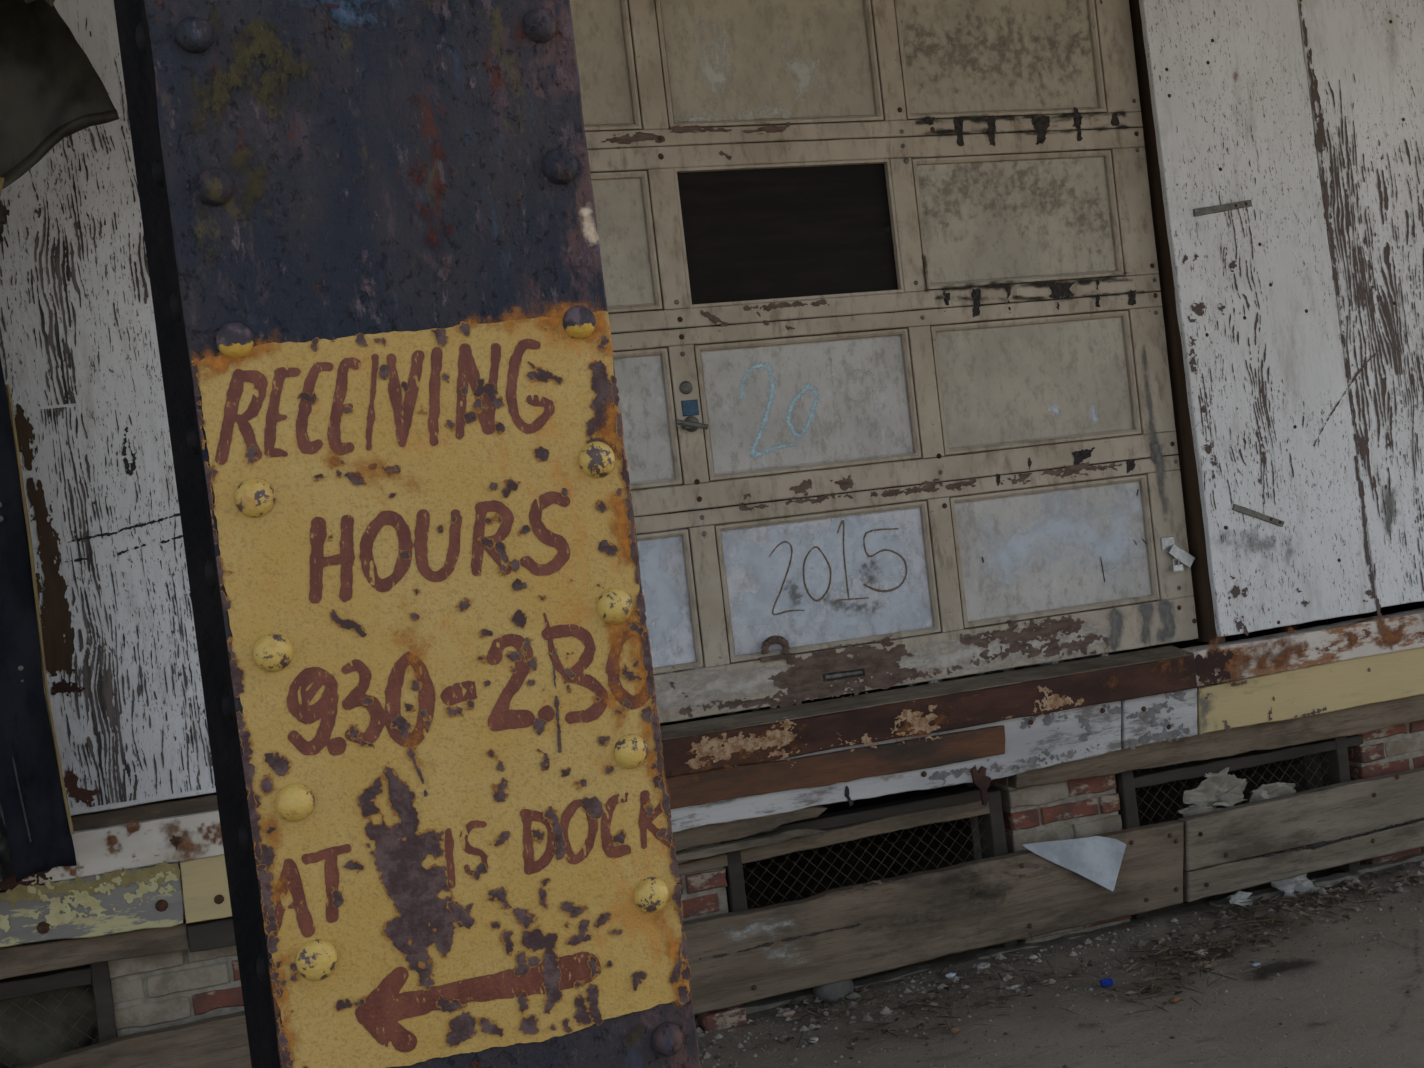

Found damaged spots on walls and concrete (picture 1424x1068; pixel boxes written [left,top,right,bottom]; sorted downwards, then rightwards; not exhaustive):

corrosion [504,304,612,354]
peeling [1188,125,1294,543]
peeling [1323,72,1424,602]
peeling [0,55,214,807]
corrosion [600,405,626,459]
corrosion [610,495,631,563]
corrosion [606,613,647,726]
peeling [584,336,1109,1005]
peeling [0,860,182,932]
corrosion [107,820,140,853]
corrosion [167,824,222,859]
peeling [344,679,623,1048]